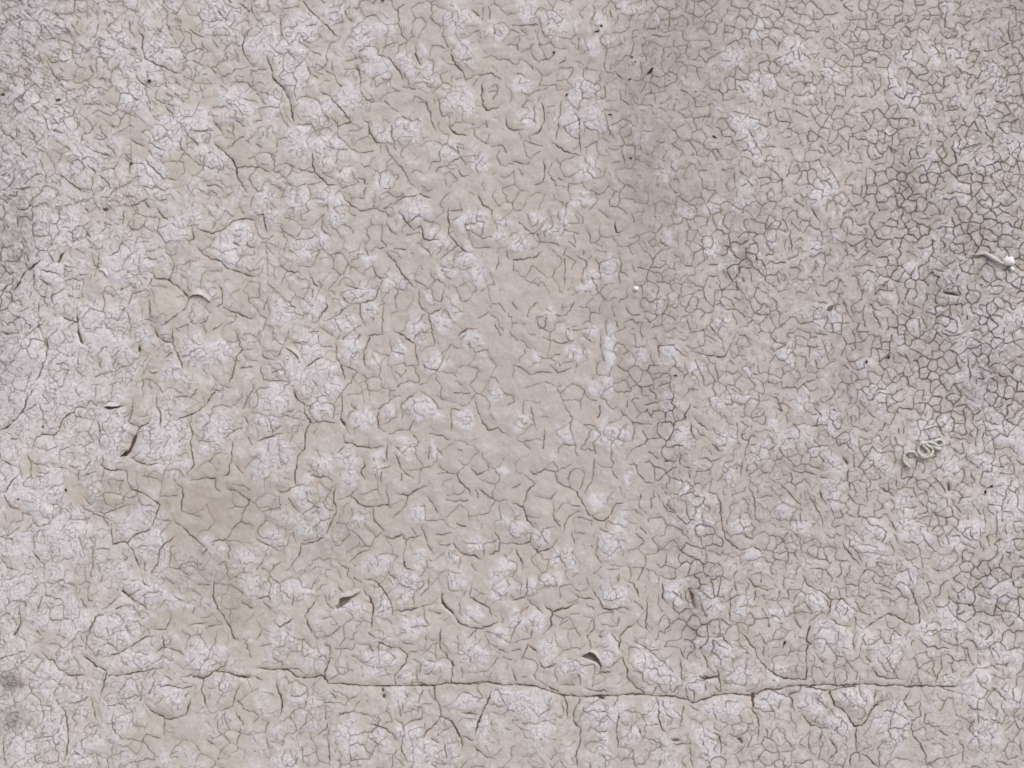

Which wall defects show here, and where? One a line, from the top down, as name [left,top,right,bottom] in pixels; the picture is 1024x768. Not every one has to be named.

crack [472,84,502,113]
crack [491,151,546,241]
crack [510,194,584,250]
crack [496,246,628,303]
crack [477,302,601,377]
crack [515,407,545,449]
crack [525,382,601,456]
crack [332,437,382,484]
crack [361,444,392,499]
crack [470,587,495,618]
crack [470,743,502,768]
crack [674,734,693,768]